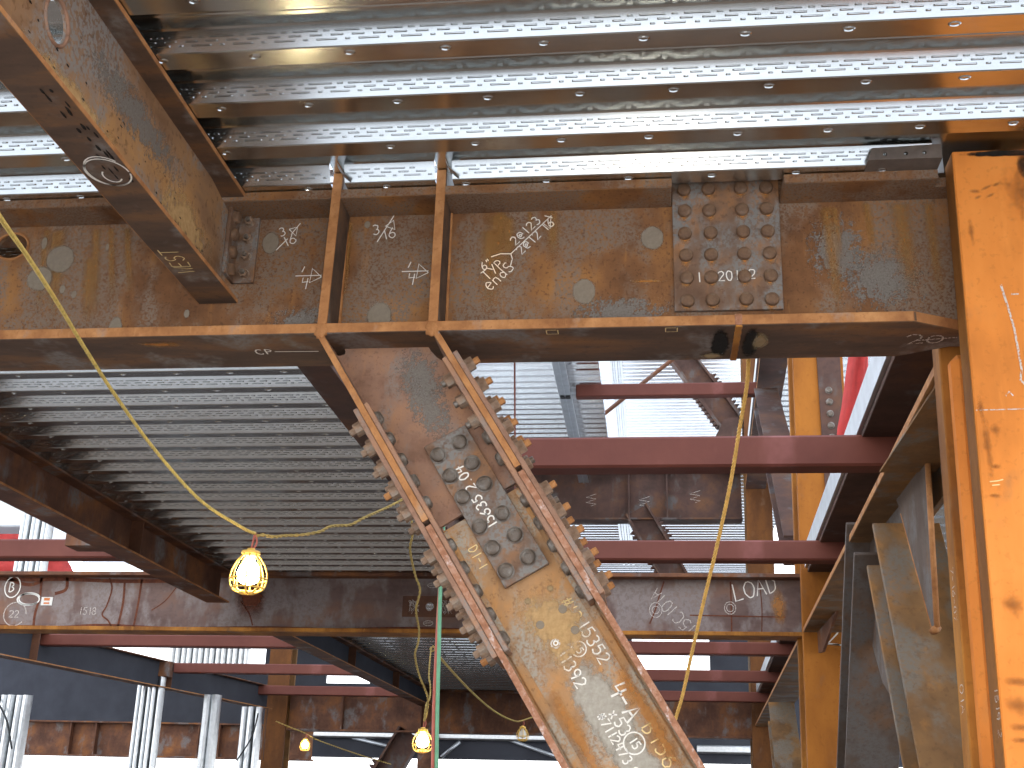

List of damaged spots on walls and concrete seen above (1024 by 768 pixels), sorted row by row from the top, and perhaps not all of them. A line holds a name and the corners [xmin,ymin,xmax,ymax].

corrosion [42,55,101,129]
corrosion [161,188,203,251]
corrosion [0,577,176,627]
corrosion [223,579,308,628]
corrosion [525,598,581,661]
corrosion [690,582,785,632]
corrosion [557,698,599,768]
corrosion [624,673,679,766]